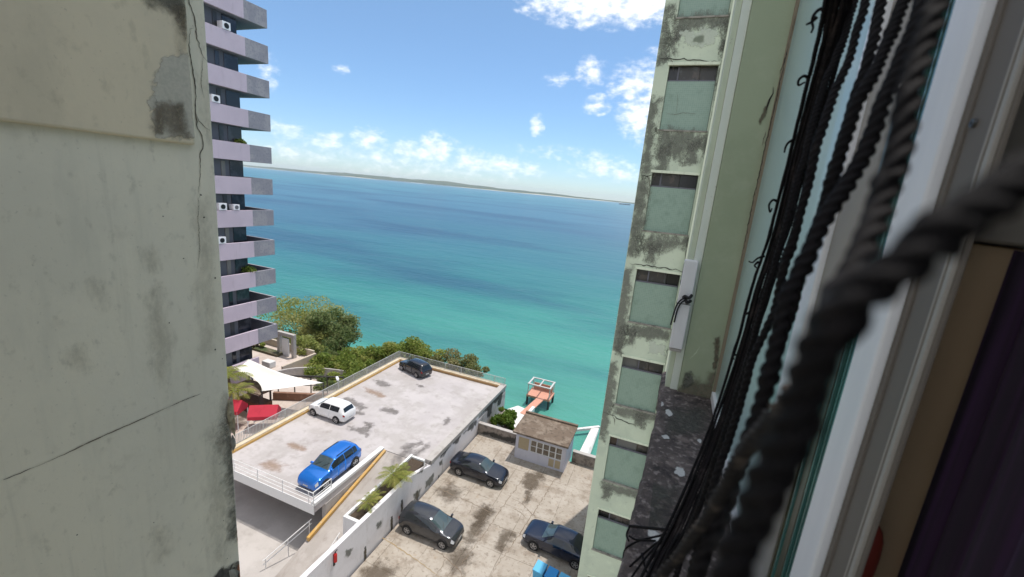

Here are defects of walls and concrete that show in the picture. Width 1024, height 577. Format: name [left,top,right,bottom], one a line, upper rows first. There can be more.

damp [149,0,187,39]
damp [657,5,731,66]
peeling [147,54,195,139]
crack [189,2,209,269]
crack [741,20,795,259]
damp [599,98,720,443]
crack [4,395,197,480]